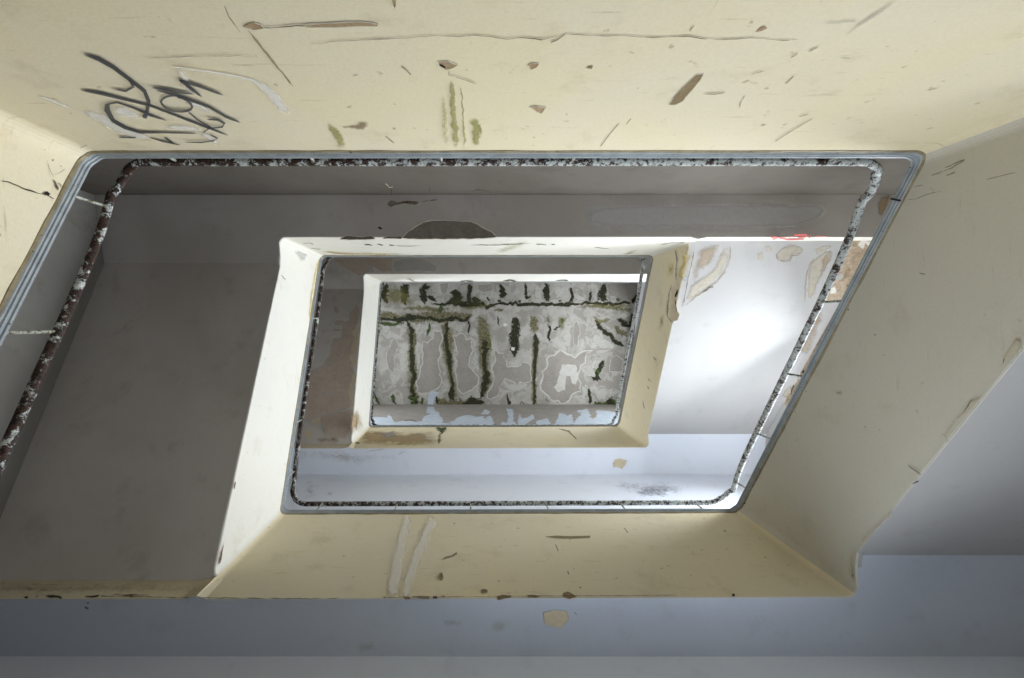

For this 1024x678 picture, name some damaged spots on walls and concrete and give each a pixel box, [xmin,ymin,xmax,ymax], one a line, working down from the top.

crack [326,34,788,43]
spalling [669,73,704,105]
crack [2,165,65,199]
spalling [339,219,497,240]
damp [534,286,585,301]
peeling [607,284,638,301]
damp [399,323,440,373]
damp [591,325,616,350]
peeling [371,321,619,425]
damp [572,360,609,399]
spalling [384,589,545,600]
peeling [543,591,667,629]